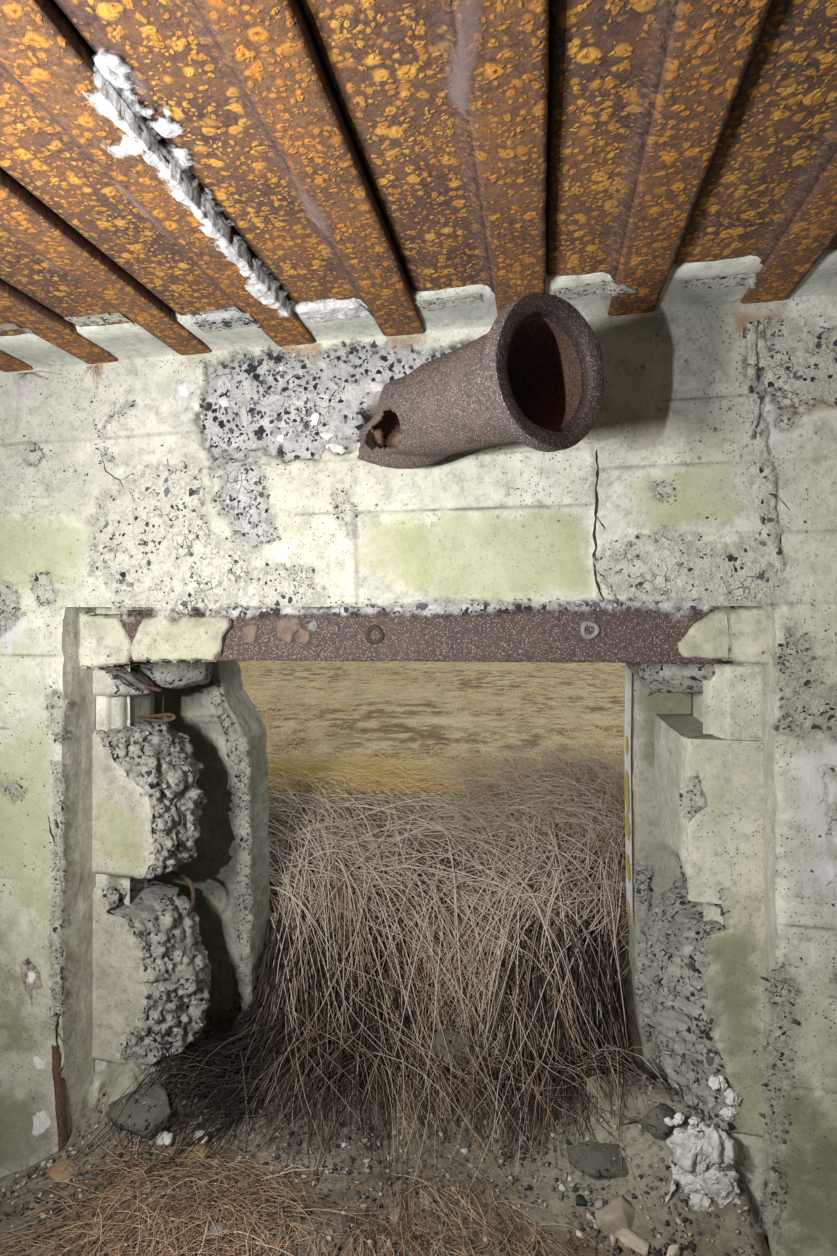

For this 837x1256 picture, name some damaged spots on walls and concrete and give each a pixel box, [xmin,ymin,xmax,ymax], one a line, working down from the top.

damp [83,50,371,323]
spalling [188,307,263,333]
spalling [415,294,483,311]
spalling [551,280,637,299]
spalling [678,274,756,291]
spalling [752,315,837,430]
spalling [63,400,136,485]
spalling [77,339,789,621]
corrosion [276,616,310,645]
flaking render [103,750,197,898]
spalling [203,676,253,1011]
flaking render [130,897,207,1056]